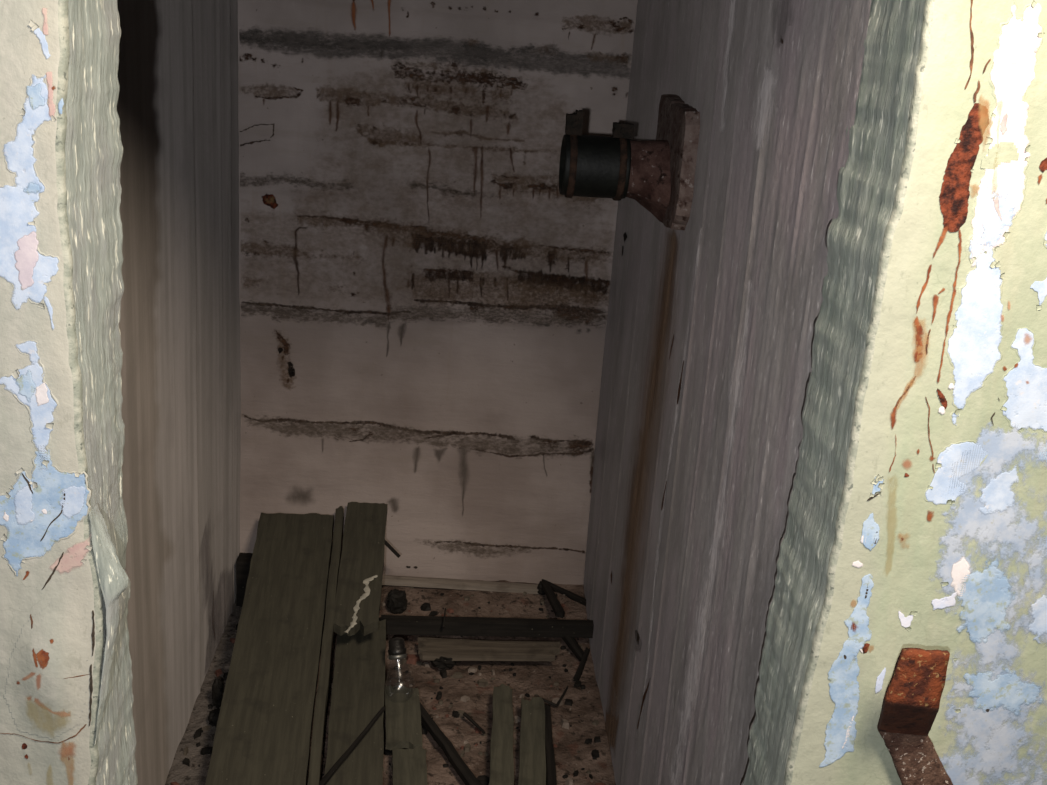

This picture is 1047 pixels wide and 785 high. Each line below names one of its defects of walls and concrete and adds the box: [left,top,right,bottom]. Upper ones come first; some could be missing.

peeling [28,8,51,59]
leakage [239,29,630,77]
rust [1038,158,1047,184]
peeling [0,72,64,330]
rust [889,59,991,477]
peeling [924,0,1047,785]
peeling [867,474,885,501]
peeling [0,340,128,744]
peeling [861,513,880,551]
peeling [898,611,918,631]
peeling [819,560,874,767]
peeling [875,668,886,693]